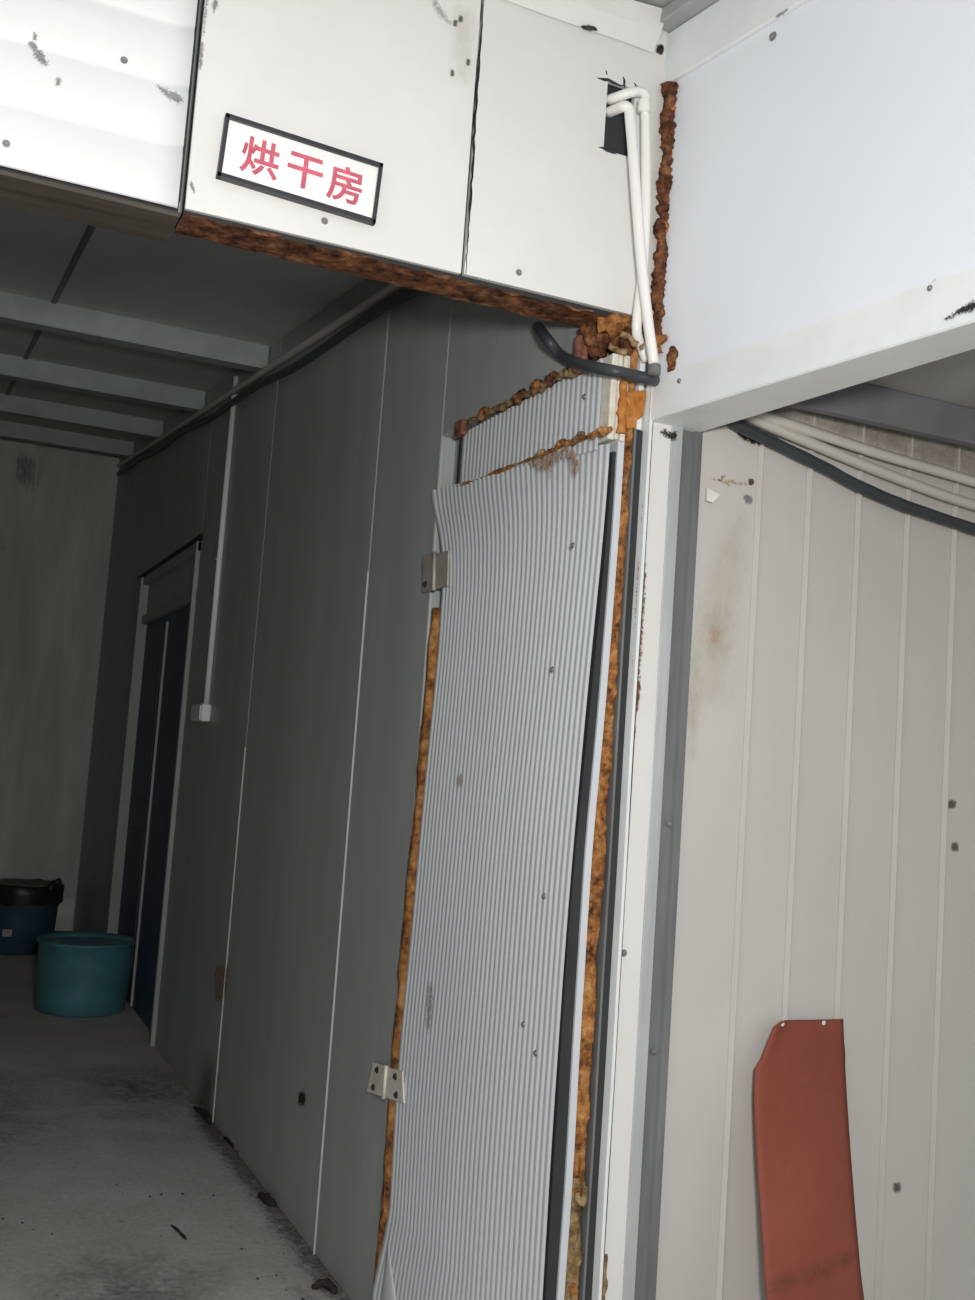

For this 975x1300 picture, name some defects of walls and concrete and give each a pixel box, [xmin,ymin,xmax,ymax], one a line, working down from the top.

corrosion [174,213,608,327]